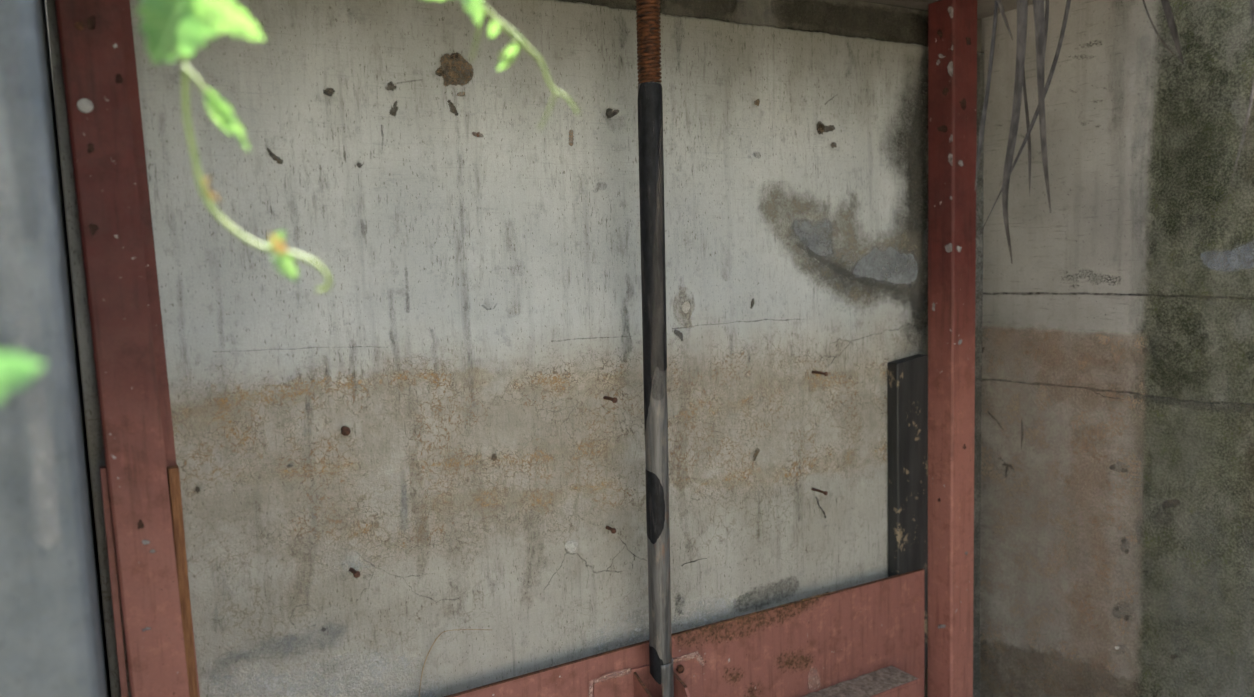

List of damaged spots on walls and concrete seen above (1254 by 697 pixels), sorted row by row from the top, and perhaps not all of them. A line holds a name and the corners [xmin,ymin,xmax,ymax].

water stain [659,0,744,22]
peeling [936,45,953,77]
peeling [948,134,963,167]
water stain [761,0,928,347]
water stain [1200,240,1254,272]
rust [667,349,888,497]
rust [173,353,644,559]
crack [565,541,578,553]